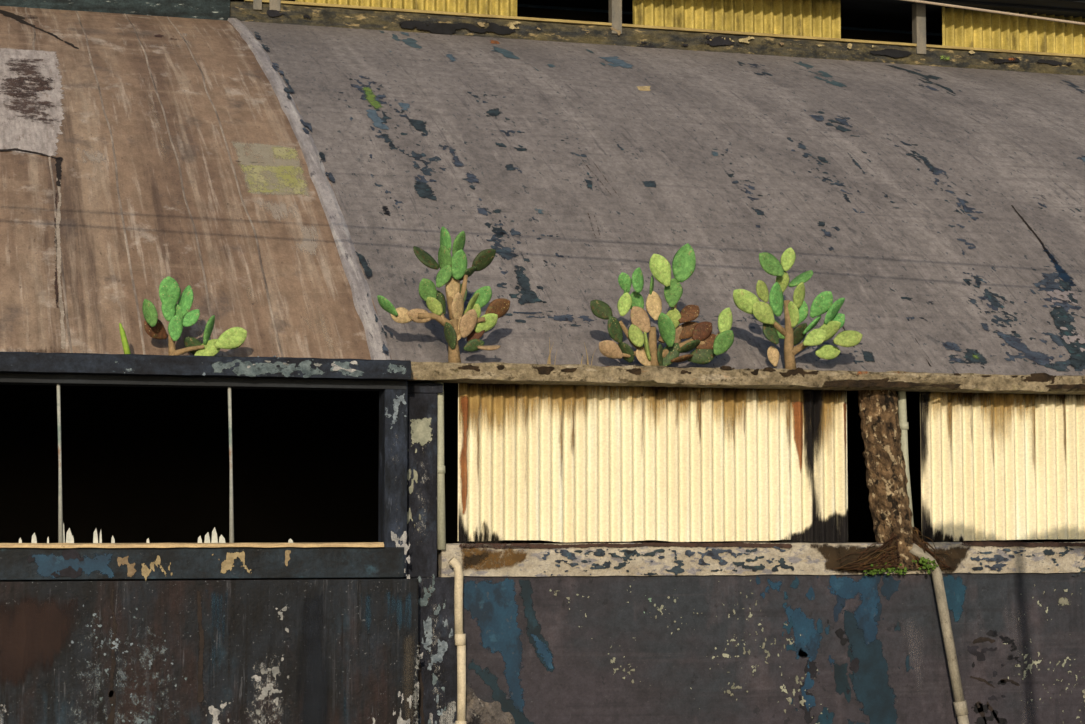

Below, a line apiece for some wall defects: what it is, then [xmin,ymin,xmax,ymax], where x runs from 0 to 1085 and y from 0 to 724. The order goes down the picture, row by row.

crack [0,10,79,49]
peeling [338,73,599,326]
peeling [894,141,984,255]
crack [54,169,66,349]
crack [1011,205,1075,286]
peeling [385,393,432,453]
corrosion [459,383,805,514]
corrosion [819,390,847,453]
peeling [212,551,252,574]
peeling [542,546,914,724]
peeling [206,701,231,724]
peeling [246,655,289,724]